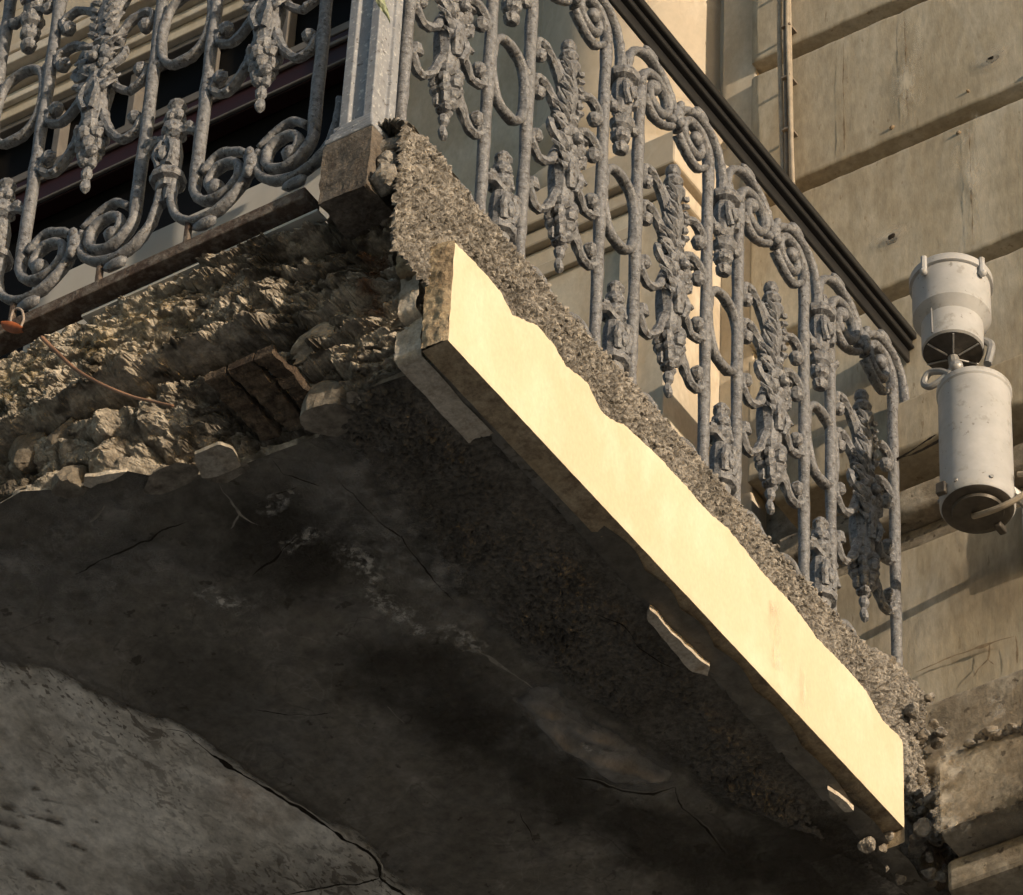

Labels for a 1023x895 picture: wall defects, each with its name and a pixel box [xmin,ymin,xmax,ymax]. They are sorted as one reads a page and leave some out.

crack [77,521,189,574]
damp [224,468,413,592]
crack [270,461,453,600]
spalling [0,117,941,895]
crack [168,727,408,895]
damp [360,647,877,895]
spalling [938,843,960,863]
spalling [963,718,1023,749]